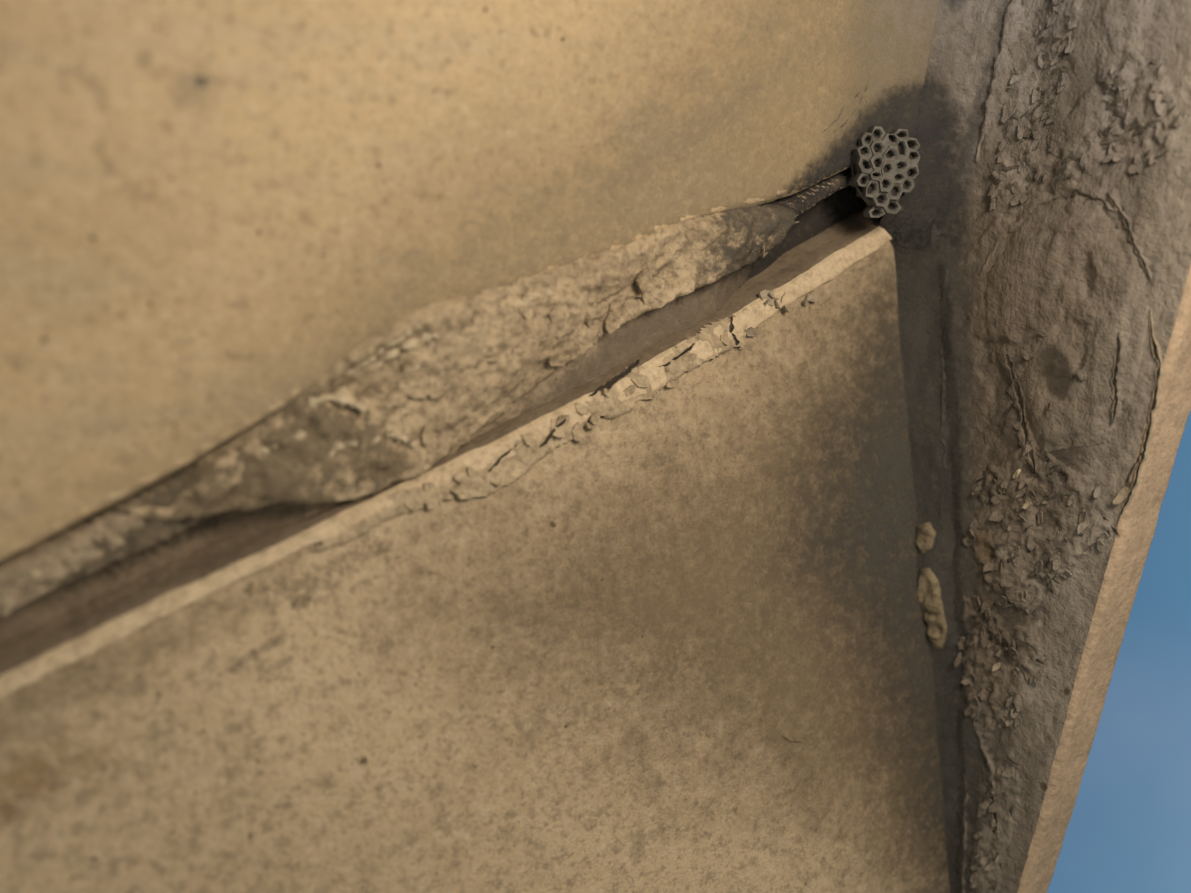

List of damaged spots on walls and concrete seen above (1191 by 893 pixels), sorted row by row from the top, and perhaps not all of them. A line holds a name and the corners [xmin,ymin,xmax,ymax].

peeling [988,0,1182,219]
crack [1108,191,1152,281]
spalling [0,203,798,616]
crack [999,338,1040,472]
spalling [1024,331,1087,414]
crack [1108,310,1165,528]
peeling [914,438,1132,740]
peeling [969,747,1023,893]